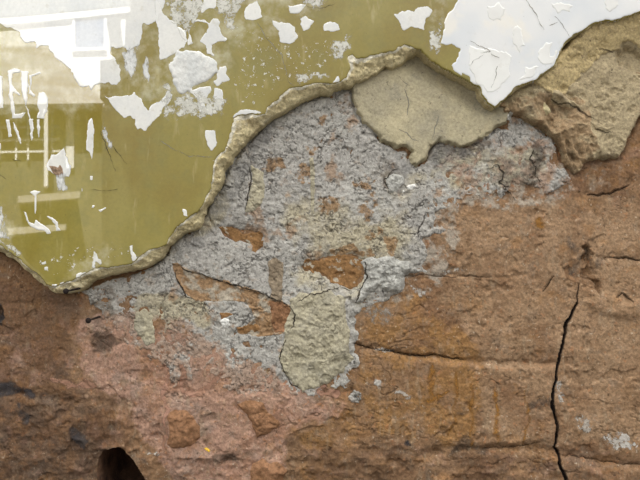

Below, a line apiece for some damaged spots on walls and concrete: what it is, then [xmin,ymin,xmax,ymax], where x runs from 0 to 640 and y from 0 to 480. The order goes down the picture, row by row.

flaking render [441,0,640,175]
crack [551,99,611,133]
flaking render [0,45,571,397]
crack [299,262,368,303]
crack [354,343,463,360]
flaking render [348,390,361,403]
crack [550,285,640,480]